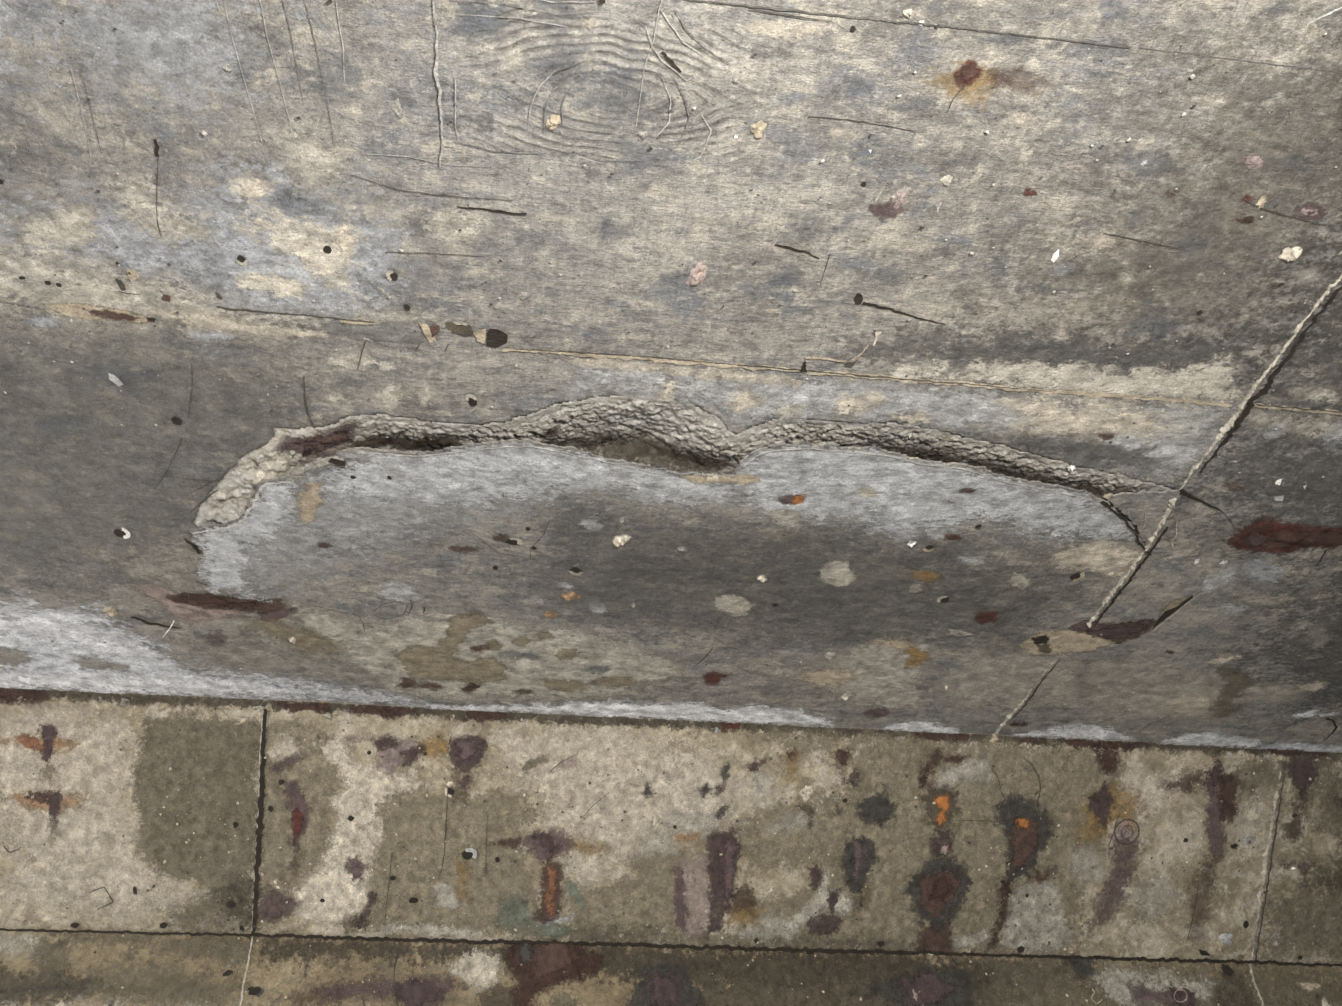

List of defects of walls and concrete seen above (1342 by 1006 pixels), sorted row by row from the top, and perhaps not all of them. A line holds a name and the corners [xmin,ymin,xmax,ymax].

crack [1104,233,1190,251]
crack [1179,286,1342,529]
spalling [192,394,1175,534]
spalling [506,527,537,550]
crack [858,439,1168,626]
rust [0,724,79,762]
crack [1013,659,1061,718]
spalling [1019,629,1115,656]
rust [490,829,598,925]
rust [673,827,759,939]
rust [902,732,975,954]
rust [988,793,1055,947]